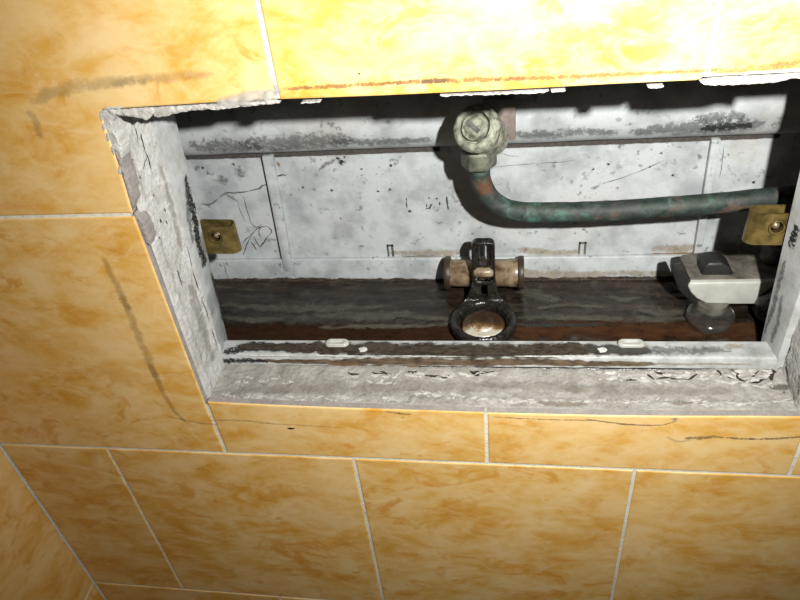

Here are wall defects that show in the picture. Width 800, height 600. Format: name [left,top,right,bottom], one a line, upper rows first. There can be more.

water stain [506,112,780,154]
water stain [185,135,440,177]
water stain [185,176,444,319]
crack [627,370,697,381]
crack [716,333,794,384]